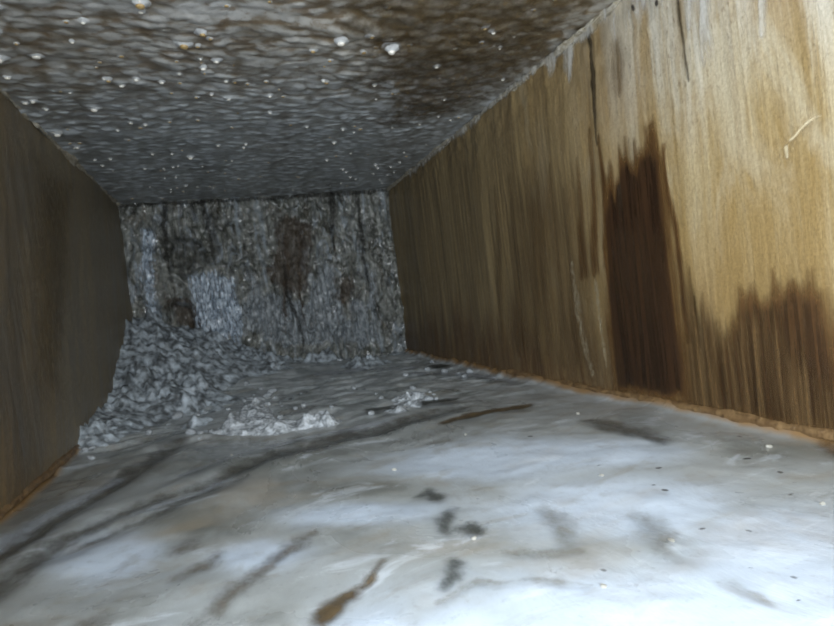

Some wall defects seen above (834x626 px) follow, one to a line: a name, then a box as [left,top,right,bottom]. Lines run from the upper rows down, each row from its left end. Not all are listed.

leakage [677,0,710,81]
leakage [356,0,622,191]
leakage [139,229,156,312]
leakage [188,261,383,349]
leakage [686,288,834,430]